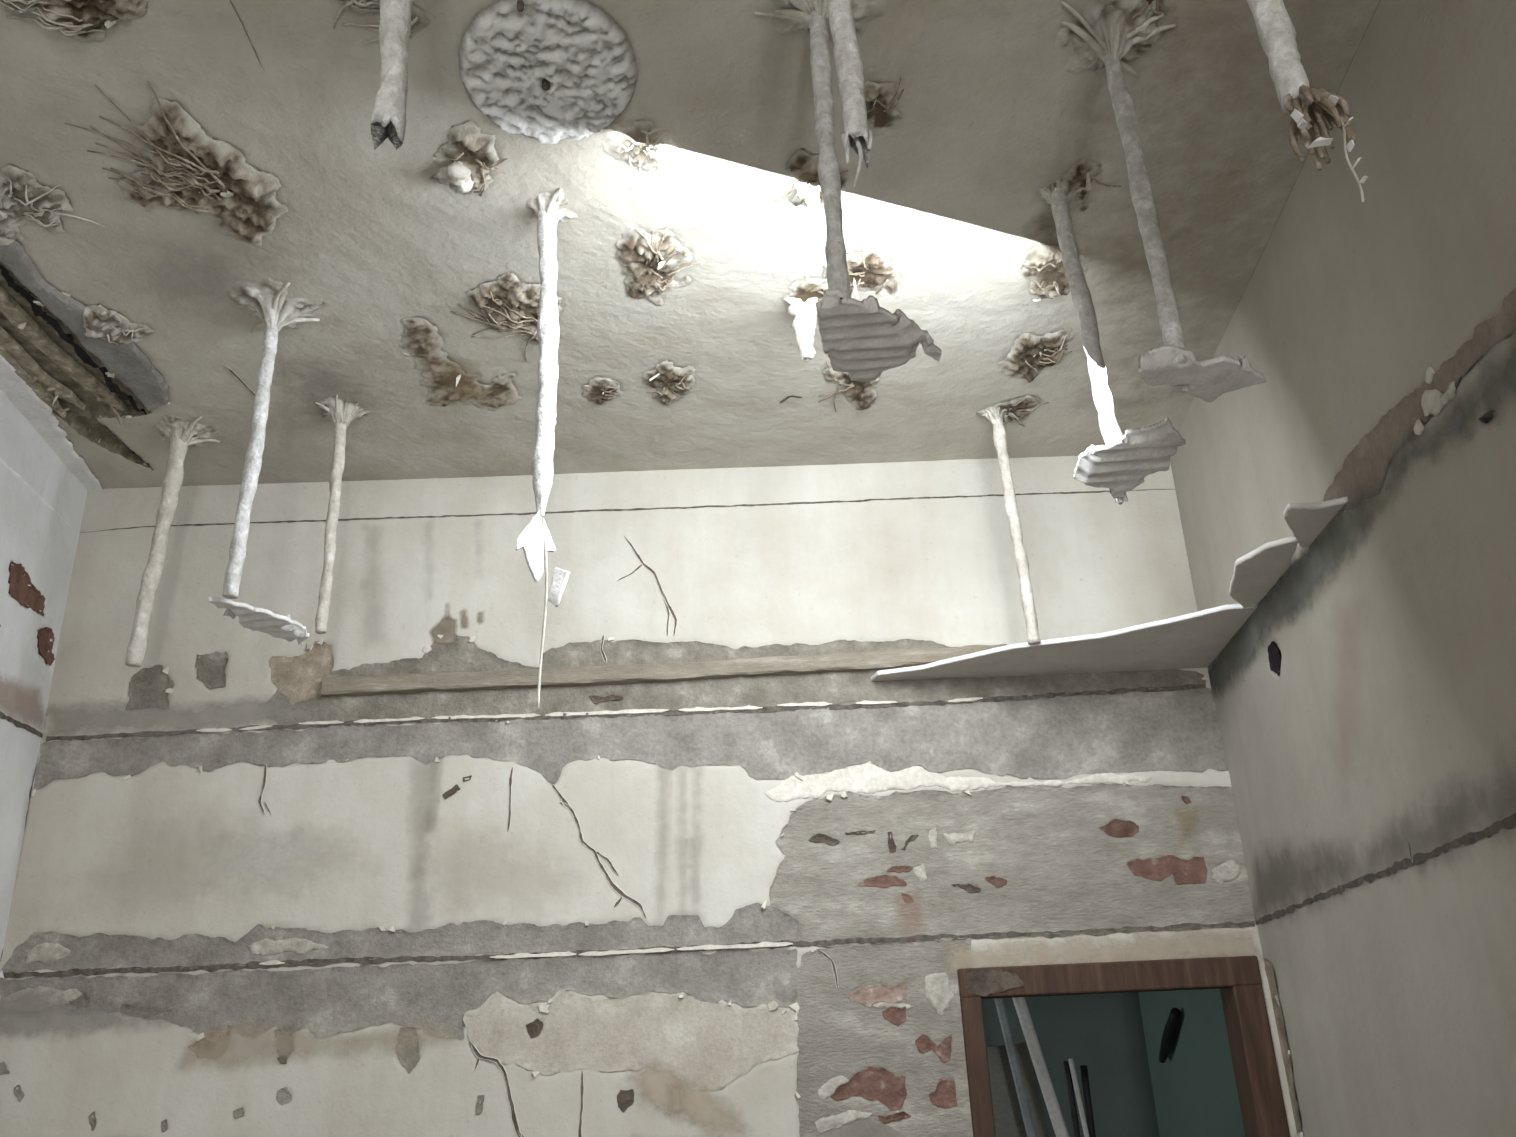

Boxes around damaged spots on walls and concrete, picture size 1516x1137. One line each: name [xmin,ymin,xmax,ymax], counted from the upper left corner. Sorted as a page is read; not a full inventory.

flaking render [0,240,170,471]
peeling [1323,287,1516,512]
flaking render [8,560,55,666]
crack [599,635,607,663]
crack [80,489,1169,636]
leakage [1208,344,1516,693]
crack [0,684,1206,832]
peeling [0,633,1256,1137]
crack [0,785,1516,992]
crack [469,1040,525,1137]
crack [576,1071,584,1137]